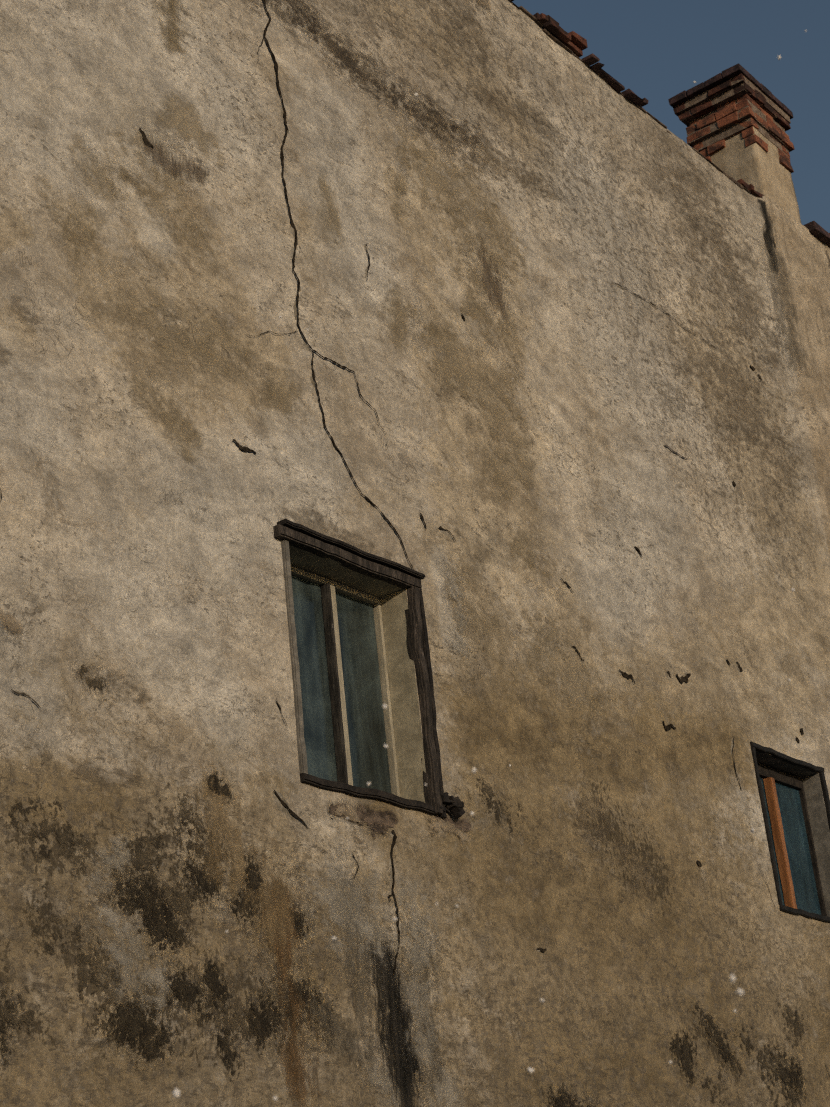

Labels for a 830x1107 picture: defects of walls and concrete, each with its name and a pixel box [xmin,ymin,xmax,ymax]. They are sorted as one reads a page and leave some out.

damp [137,137,208,249]
damp [252,0,525,352]
crack [249,0,414,570]
crack [420,513,455,540]
mould [8,797,76,863]
mould [208,771,234,803]
mould [35,811,335,1081]
crack [389,830,400,976]
mould [0,985,42,1065]
damp [370,939,422,1107]
mould [668,995,809,1107]